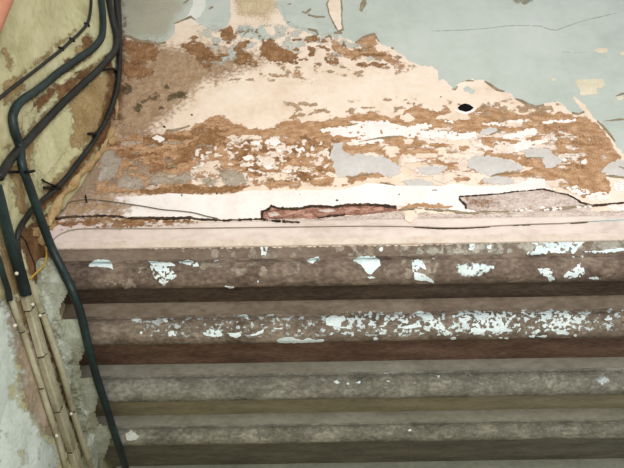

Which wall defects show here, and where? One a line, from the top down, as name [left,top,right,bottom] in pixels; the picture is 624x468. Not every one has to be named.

spalling [4,52,51,106]
peeling [18,0,624,224]
crack [55,214,300,230]
crack [398,208,520,223]
peeling [54,233,624,289]
spalling [0,165,114,468]
peeling [131,308,623,343]